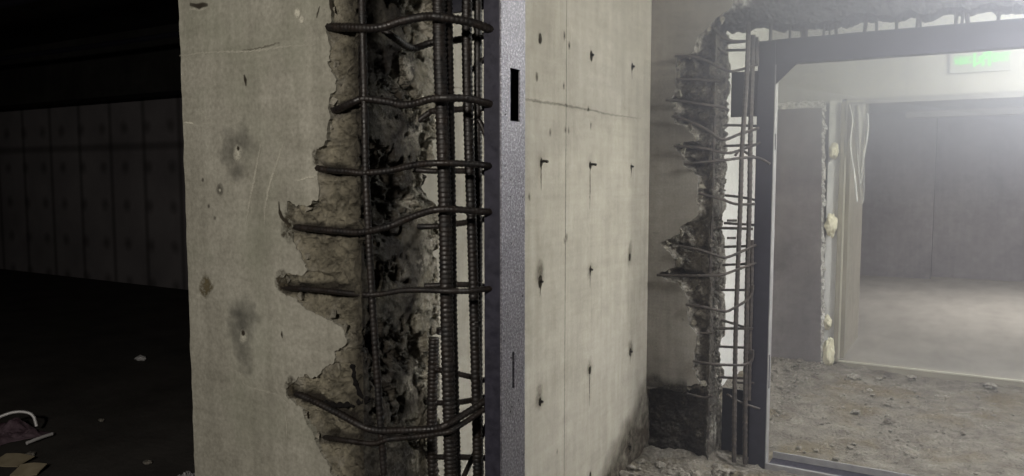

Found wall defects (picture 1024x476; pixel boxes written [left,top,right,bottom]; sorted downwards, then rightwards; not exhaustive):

corrosion [200,278,213,296]
spalling [279,0,494,476]
spalling [648,16,772,465]